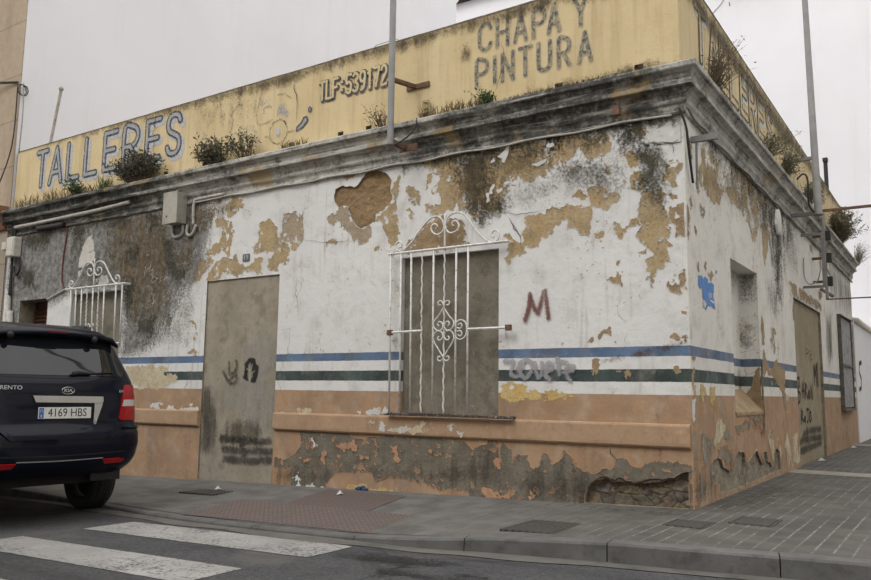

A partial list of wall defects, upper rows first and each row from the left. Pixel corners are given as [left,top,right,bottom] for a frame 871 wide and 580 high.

water stain [74,0,556,137]
water stain [692,0,812,170]
water stain [6,202,234,358]
peeling [170,197,305,283]
peeling [327,132,769,295]
water stain [697,131,794,314]
flaking render [274,316,801,510]